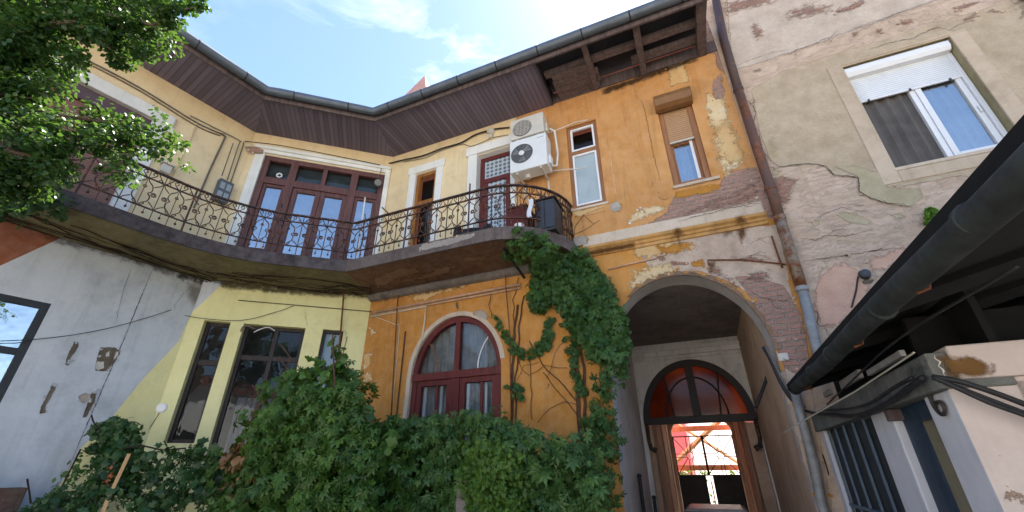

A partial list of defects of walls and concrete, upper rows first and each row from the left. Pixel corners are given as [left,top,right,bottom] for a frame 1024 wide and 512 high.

spalling [788,1,864,18]
crack [747,100,902,261]
spalling [618,21,905,512]
spalling [65,342,79,366]
spalling [95,347,122,371]
spalling [40,383,57,414]
spalling [83,389,100,417]